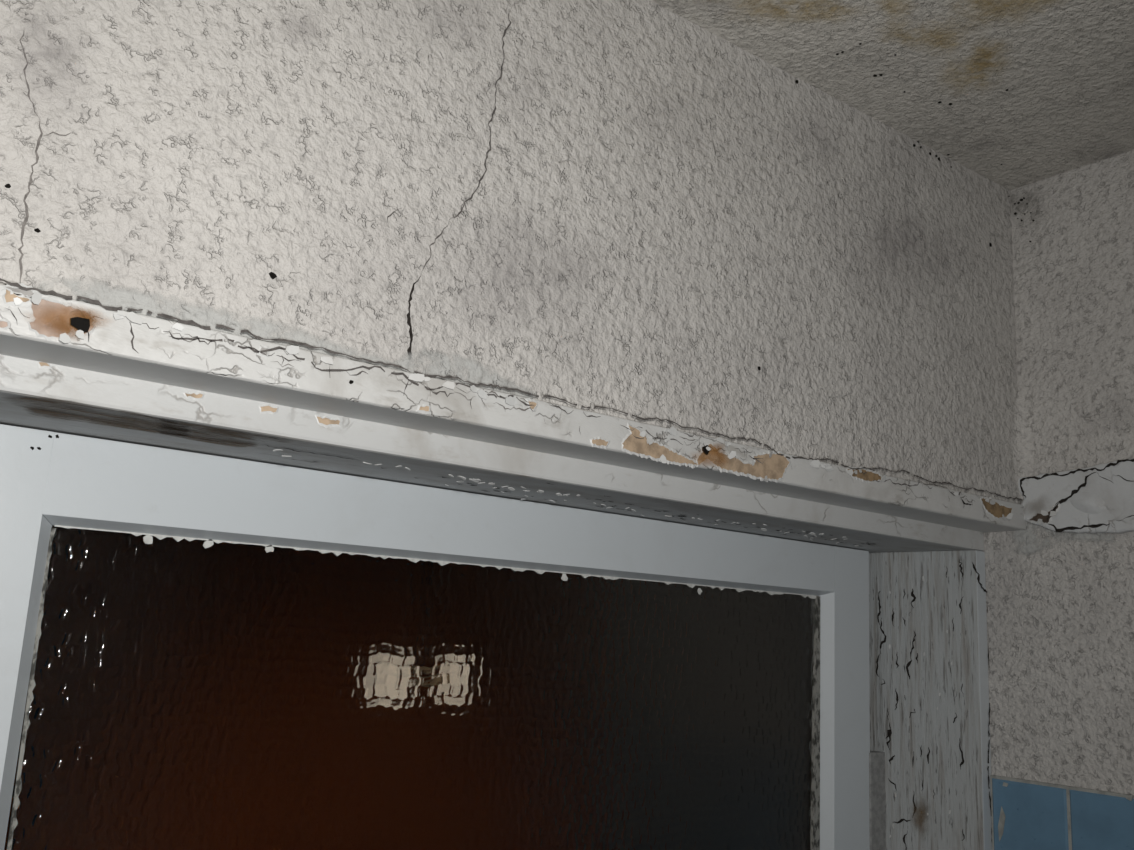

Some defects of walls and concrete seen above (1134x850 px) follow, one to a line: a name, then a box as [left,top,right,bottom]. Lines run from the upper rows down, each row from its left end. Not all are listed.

crack [0,14,1134,532]
water stain [14,398,283,447]
peeling [590,422,791,483]
peeling [980,497,1013,520]
crack [972,562,988,613]
crack [985,703,993,833]